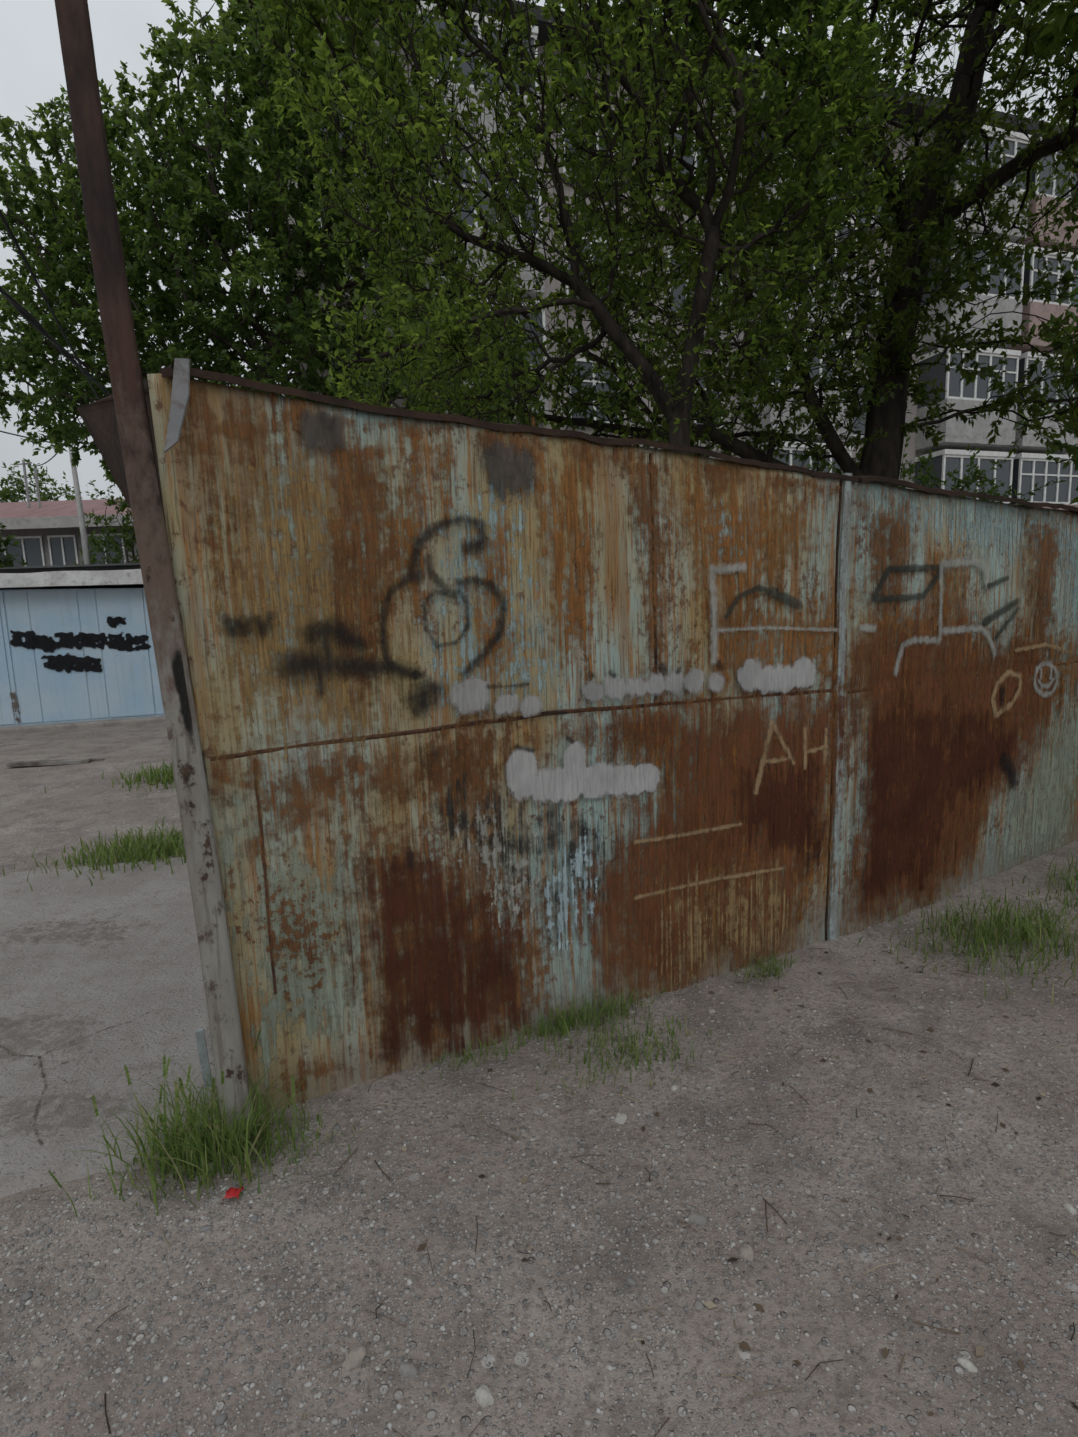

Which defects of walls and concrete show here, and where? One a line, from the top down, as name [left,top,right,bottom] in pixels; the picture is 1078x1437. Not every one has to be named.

peeling [431,788,552,934]
corrosion [179,387,1078,1108]